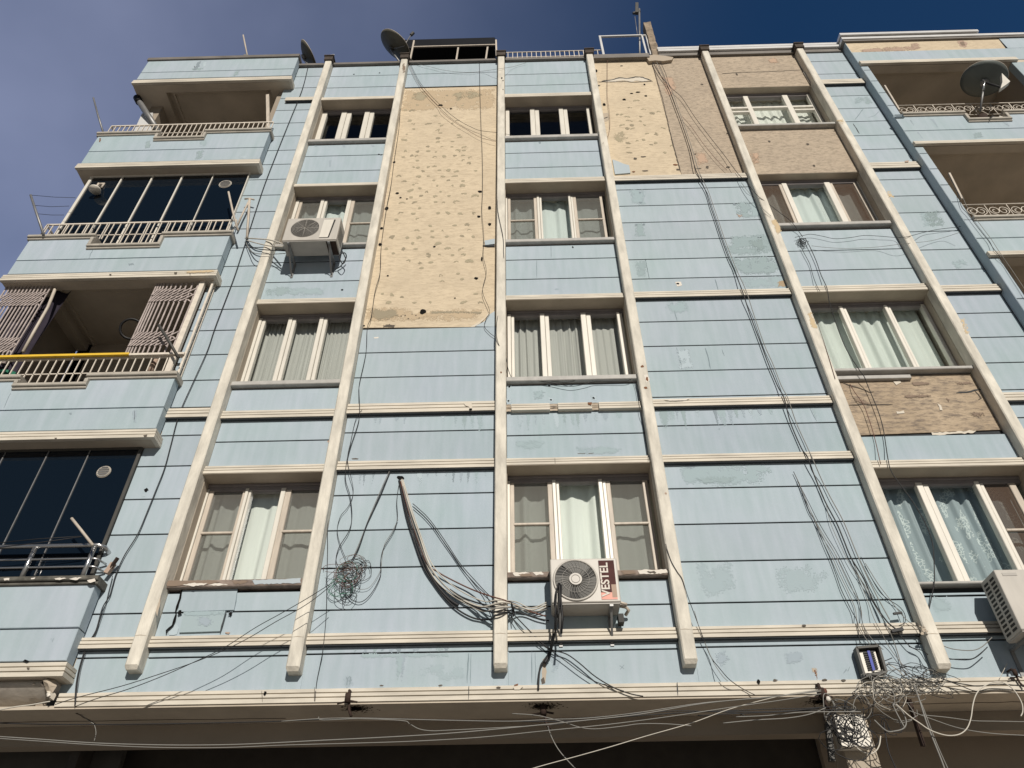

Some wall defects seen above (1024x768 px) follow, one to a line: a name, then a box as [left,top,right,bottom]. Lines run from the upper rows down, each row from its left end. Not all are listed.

flaking render [594,55,859,176]
flaking render [363,77,504,339]
flaking render [840,374,1002,436]